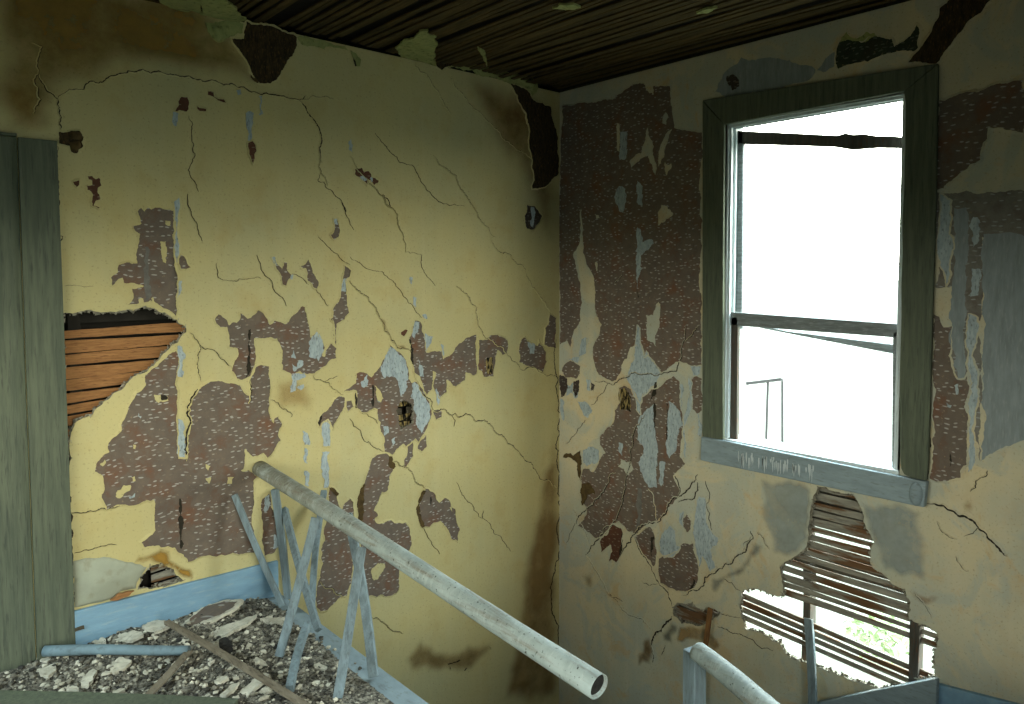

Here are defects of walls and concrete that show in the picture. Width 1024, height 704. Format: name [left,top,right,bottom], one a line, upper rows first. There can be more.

crack [32,42,354,240]
spalling [230,20,361,166]
crack [184,333,228,461]
peeling [64,205,352,563]
crack [216,256,328,306]
crack [313,373,342,395]
peeling [303,57,720,626]
crack [320,133,773,663]
peeling [928,78,1024,484]
crack [70,496,120,602]
spalling [738,487,938,688]
crack [927,471,1008,572]